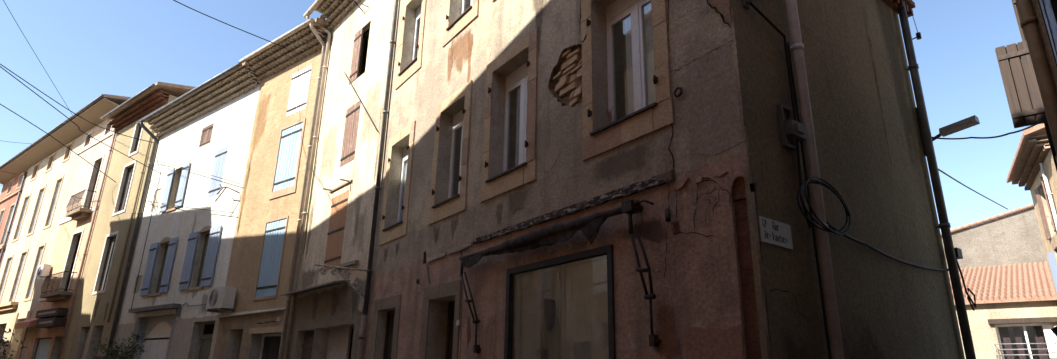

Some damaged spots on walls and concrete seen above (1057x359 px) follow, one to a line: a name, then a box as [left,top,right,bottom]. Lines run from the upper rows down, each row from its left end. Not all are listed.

spalling [548,36,586,107]
crack [664,124,731,279]
spalling [733,177,762,359]